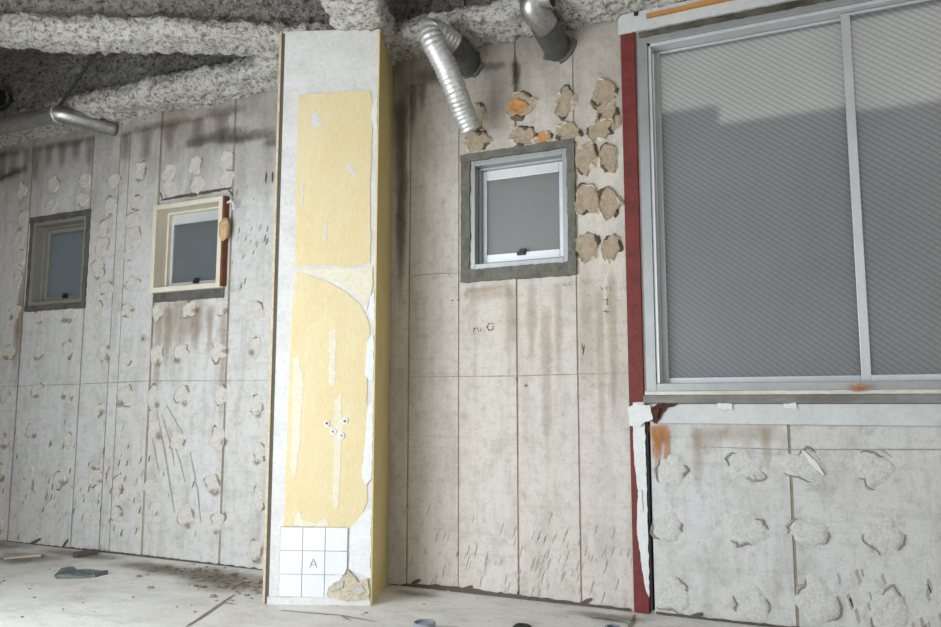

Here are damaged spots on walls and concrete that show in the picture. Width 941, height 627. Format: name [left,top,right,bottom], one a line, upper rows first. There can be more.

flaking render [162,163,177,198]
flaking render [188,155,206,194]
peeling [466,126,493,153]
peeling [506,84,578,146]
peeling [574,92,624,223]
flaking render [90,160,147,280]
peeling [574,234,624,266]
flaking render [62,308,77,323]
flaking render [183,299,196,319]
peeling [283,90,378,602]
rust [651,403,678,459]
flaking render [0,445,151,537]